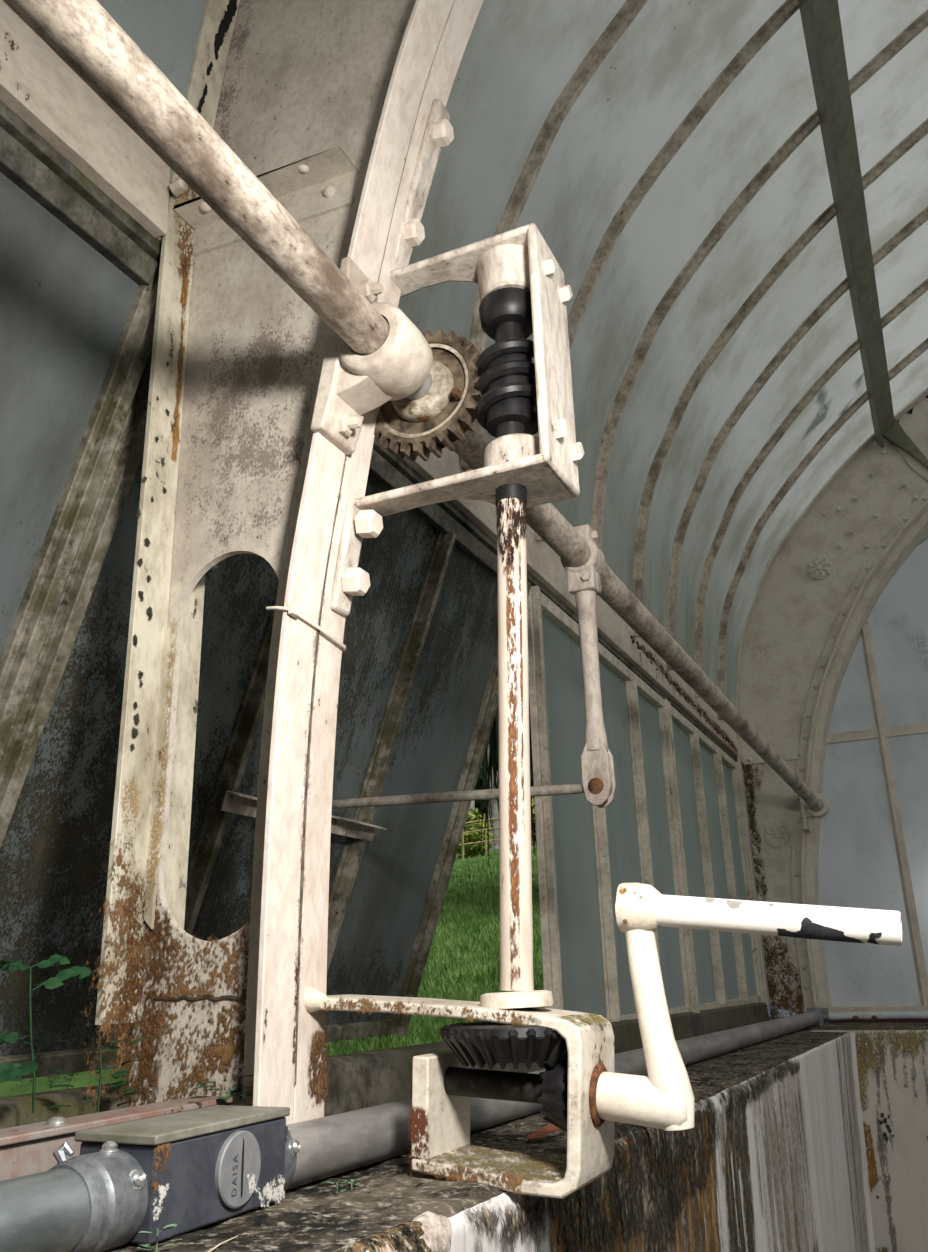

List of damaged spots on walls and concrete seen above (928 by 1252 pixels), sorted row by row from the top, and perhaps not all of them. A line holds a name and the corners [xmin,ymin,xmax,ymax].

corrosion [171,186,196,461]
corrosion [85,618,251,1107]
corrosion [742,762,767,902]
corrosion [762,935,818,1020]
damp [464,1059,800,1252]
damp [834,1033,928,1252]